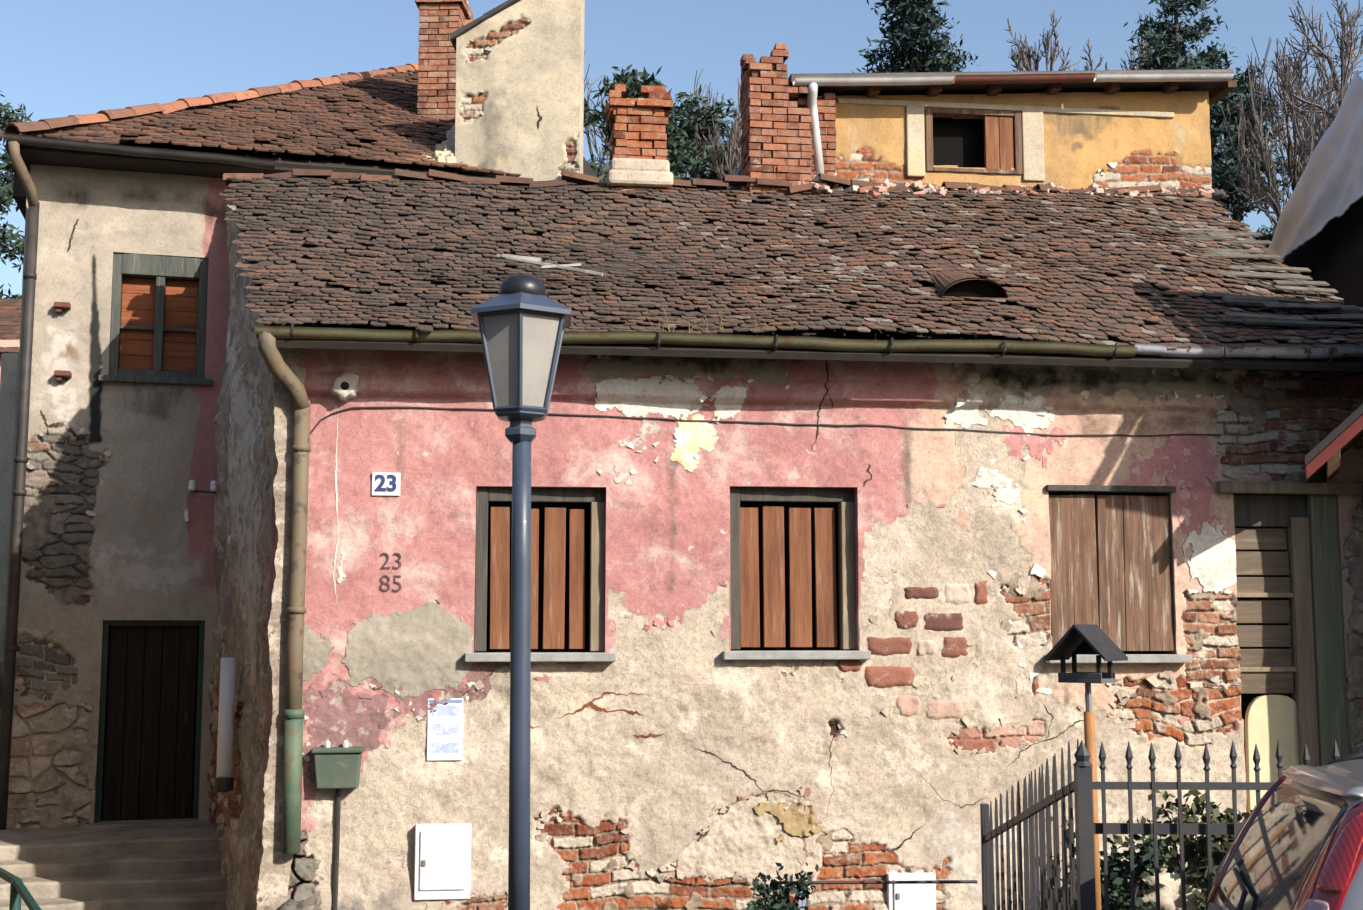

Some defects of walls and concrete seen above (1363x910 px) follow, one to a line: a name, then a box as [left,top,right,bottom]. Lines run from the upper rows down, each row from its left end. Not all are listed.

flaking render [464,18,530,62]
peeling [1092,150,1212,189]
flaking render [10,324,112,605]
crack [812,360,833,450]
flaking render [6,631,96,828]
peeling [207,318,264,843]
peeling [264,666,510,910]
crack [531,692,835,835]
crack [892,774,985,852]
peeling [530,355,1363,910]